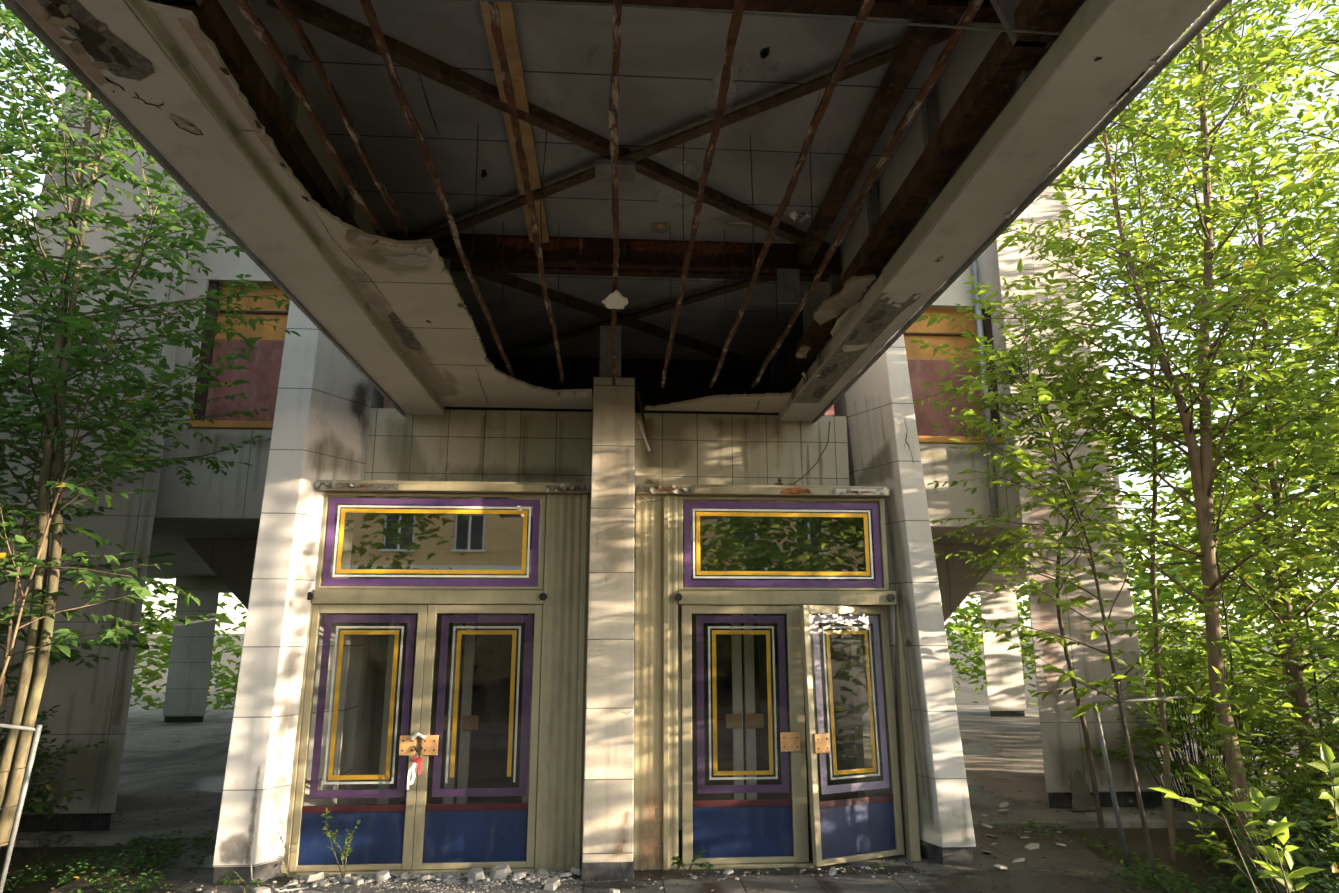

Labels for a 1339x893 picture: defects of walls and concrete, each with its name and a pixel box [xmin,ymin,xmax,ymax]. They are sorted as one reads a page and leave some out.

peeling [18,0,154,91]
peeling [794,275,921,403]
water stain [73,770,259,893]